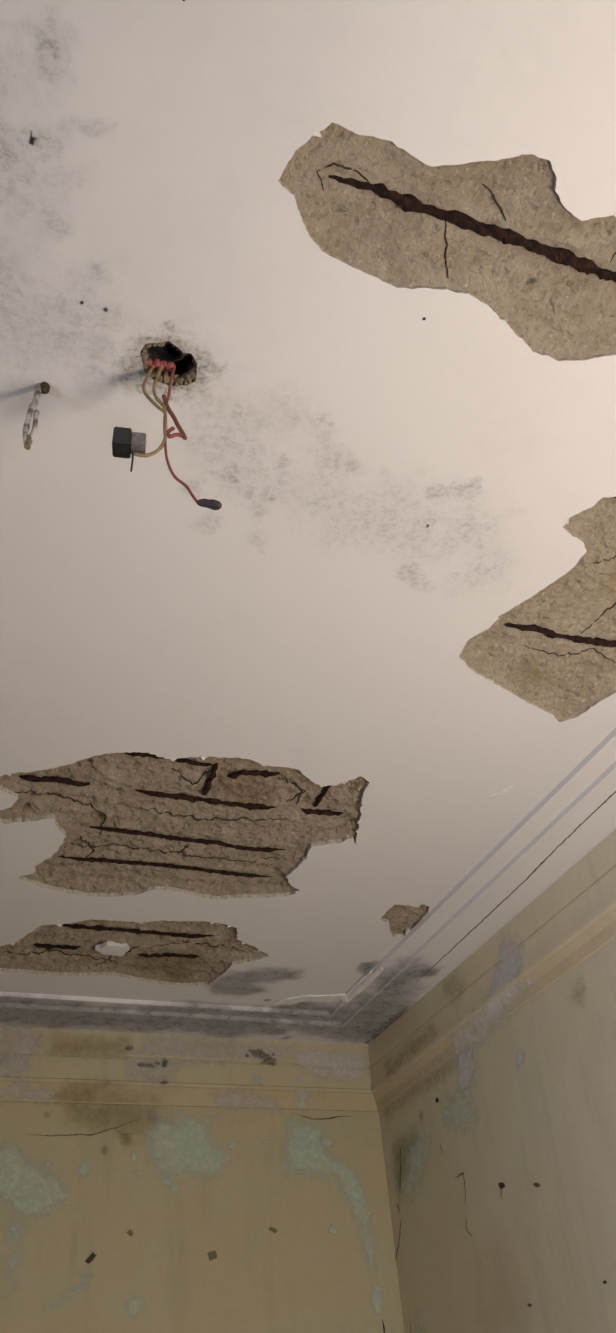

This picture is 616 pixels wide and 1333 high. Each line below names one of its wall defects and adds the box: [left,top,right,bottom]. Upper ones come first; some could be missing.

spalling [278,122,616,361]
spalling [459,497,616,723]
spalling [0,752,370,900]
spalling [0,919,269,986]
leakage [0,963,434,1044]
spalling [380,904,429,937]